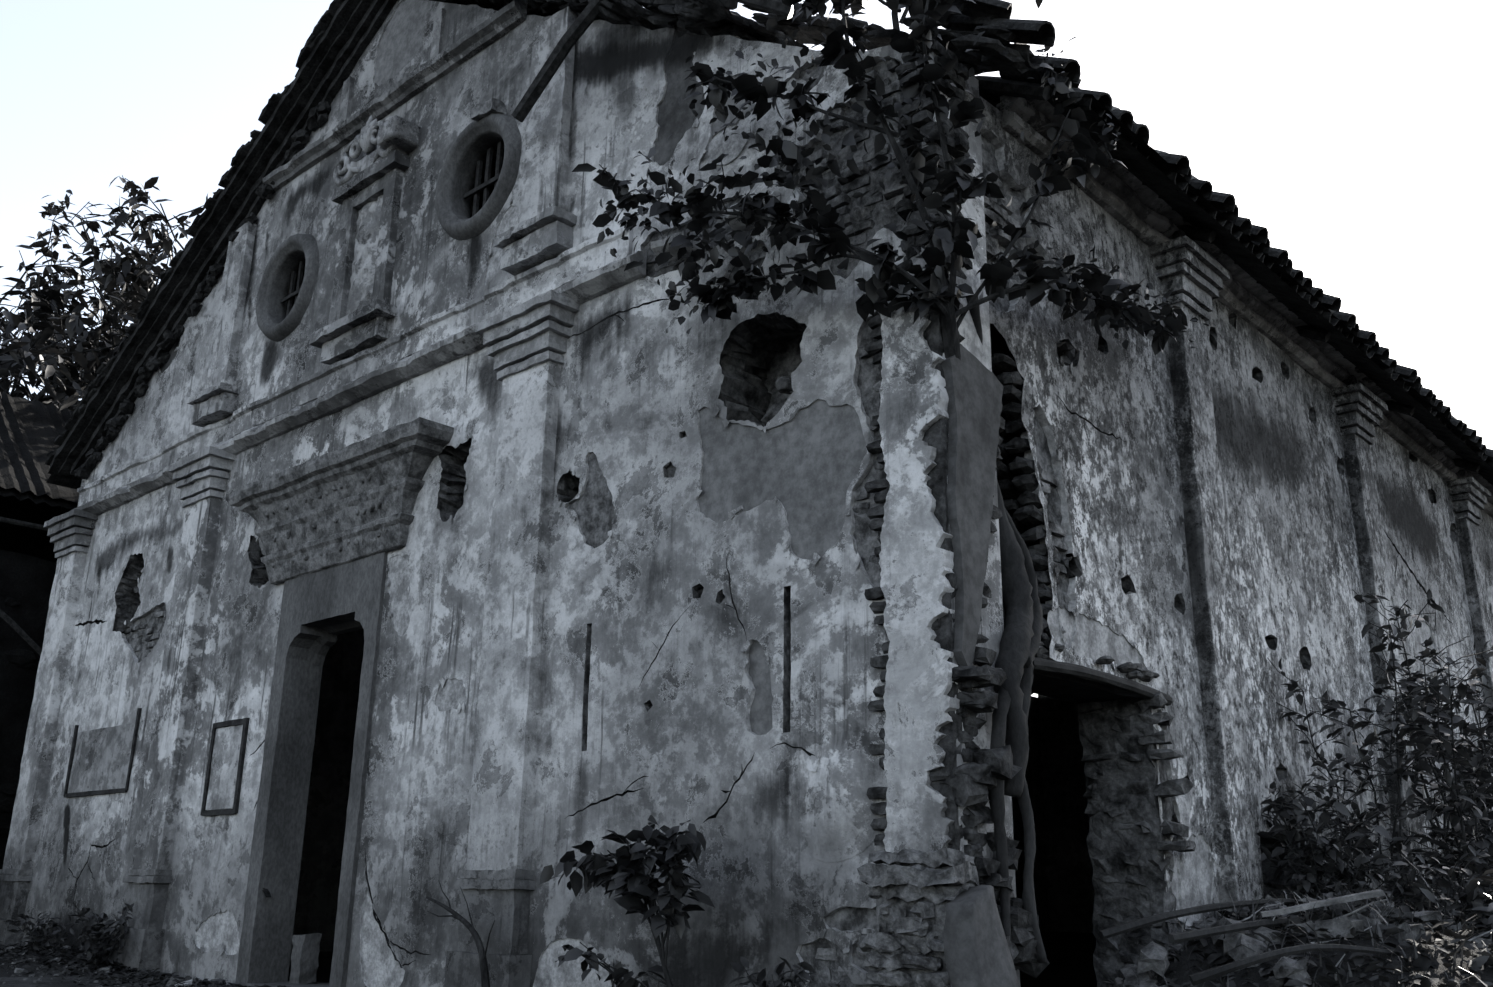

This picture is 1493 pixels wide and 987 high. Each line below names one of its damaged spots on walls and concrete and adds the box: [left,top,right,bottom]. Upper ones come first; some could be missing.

spalling [647,15,827,182]
flaking render [776,56,907,279]
flaking render [960,129,1050,319]
spalling [437,438,472,525]
peeling [557,452,615,549]
spalling [679,311,887,587]
water stain [1212,391,1308,481]
spalling [112,553,167,663]
water stain [1345,447,1438,685]
crack [566,776,649,818]
crack [703,742,815,823]
crack [365,853,430,968]